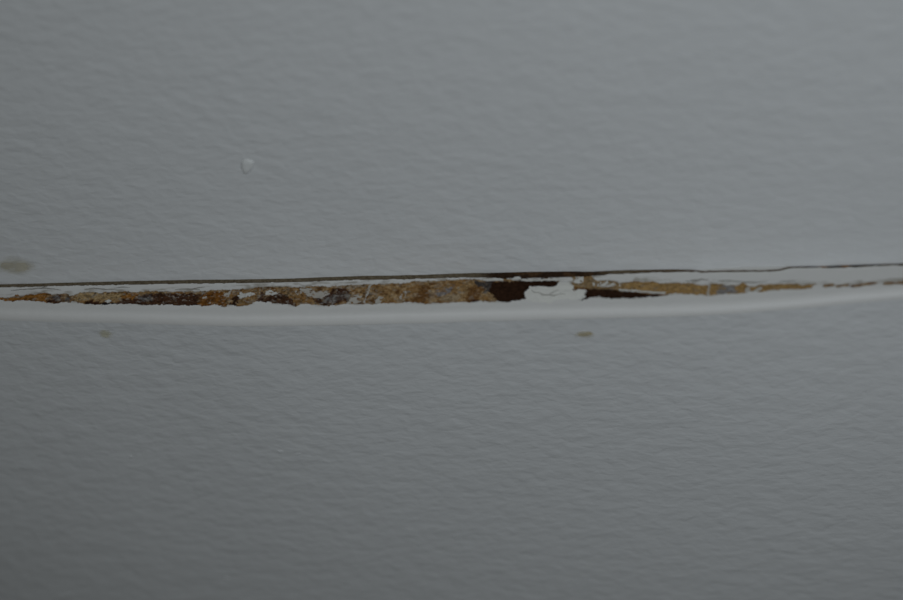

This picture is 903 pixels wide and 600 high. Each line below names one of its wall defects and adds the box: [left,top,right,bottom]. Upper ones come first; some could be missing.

crack [0,263,903,296]
peeling [0,276,903,307]